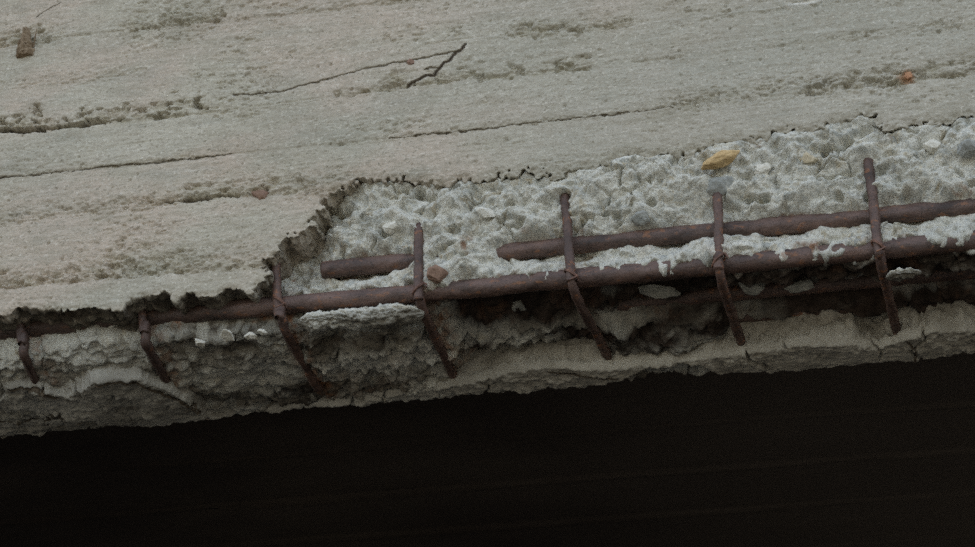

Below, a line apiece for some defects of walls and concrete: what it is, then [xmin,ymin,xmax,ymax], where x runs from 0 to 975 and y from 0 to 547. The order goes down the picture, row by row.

crack [233,43,467,96]
spalling [0,115,975,420]